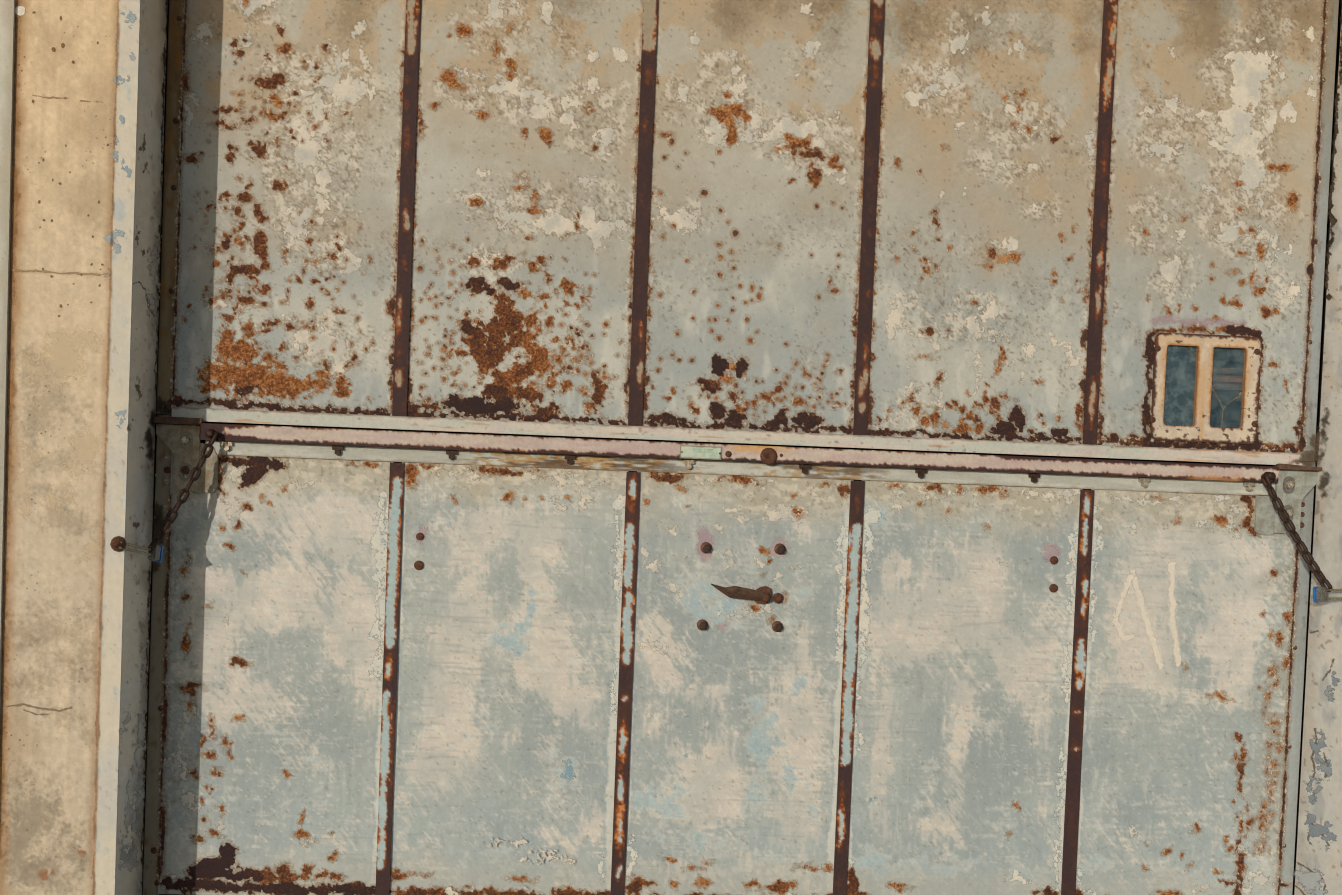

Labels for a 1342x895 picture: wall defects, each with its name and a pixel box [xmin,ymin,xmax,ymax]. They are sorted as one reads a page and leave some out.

peeling [273,19,376,275]
peeling [441,167,634,251]
peeling [452,46,630,163]
rust [168,0,1328,453]
peeling [697,49,848,185]
peeling [1138,37,1317,275]
peeling [197,299,353,378]
rust [218,455,288,552]
rust [1209,495,1261,538]
rust [156,494,730,895]
rust [1213,547,1300,895]
rust [743,863,867,895]